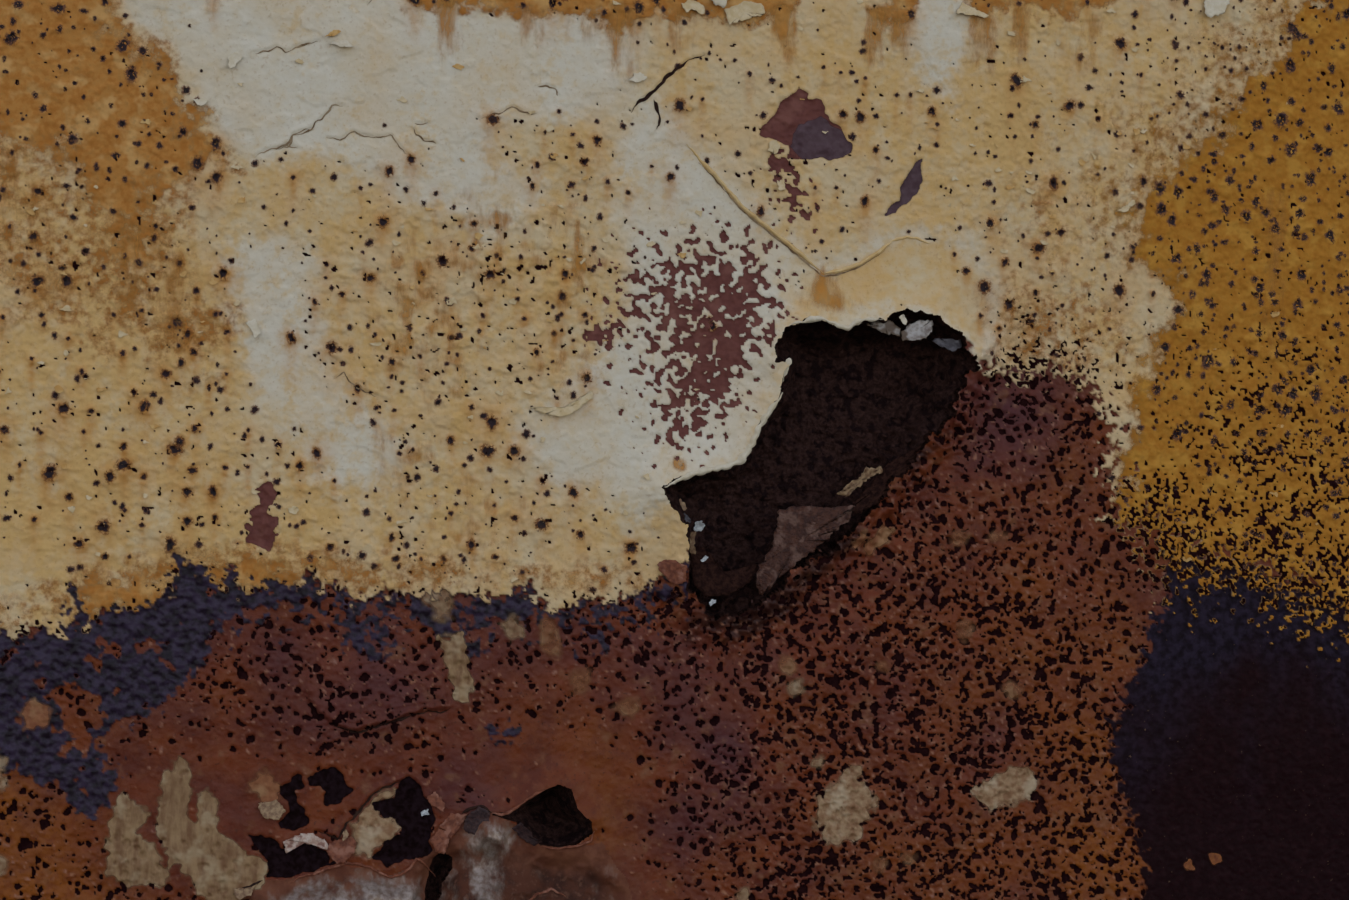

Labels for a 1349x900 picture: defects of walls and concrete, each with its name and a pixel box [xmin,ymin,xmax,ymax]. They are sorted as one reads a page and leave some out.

rust [409,0,800,59]
rust [0,0,240,360]
crack [259,104,435,155]
crack [631,55,704,128]
crack [687,145,930,277]
peeling [860,144,923,216]
spalling [940,107,1094,231]
spalling [507,333,554,394]
rust [1095,0,1349,662]
spalling [0,369,42,523]
spalling [394,414,455,456]
rust [0,543,381,627]